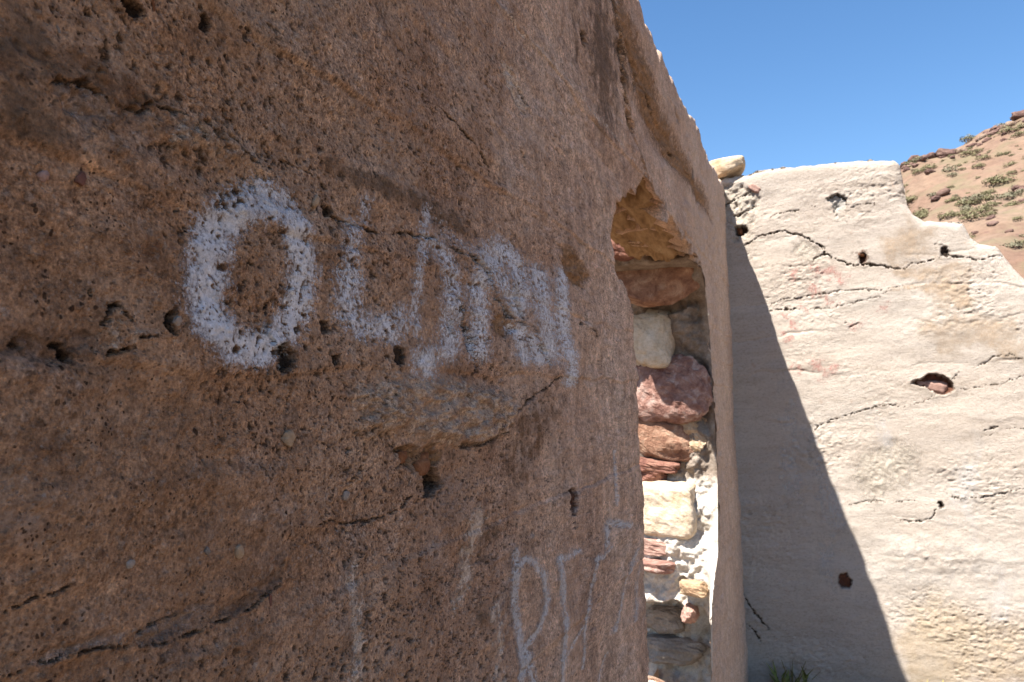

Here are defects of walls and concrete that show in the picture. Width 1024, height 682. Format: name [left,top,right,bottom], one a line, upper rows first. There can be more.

crack [443,111,489,172]
spalling [827,193,847,216]
crack [744,206,1002,327]
crack [815,396,932,430]
crack [458,432,506,448]
crack [849,488,1024,522]
crack [136,614,193,644]